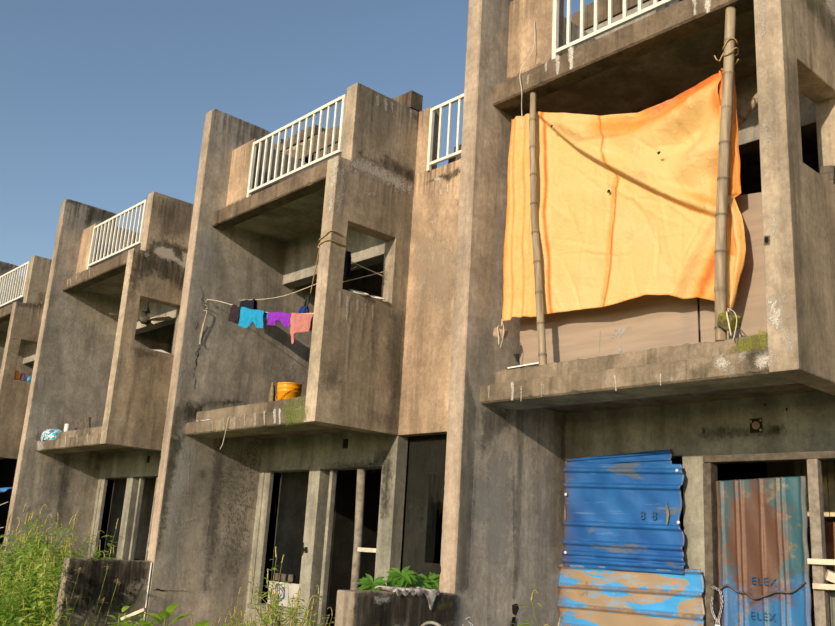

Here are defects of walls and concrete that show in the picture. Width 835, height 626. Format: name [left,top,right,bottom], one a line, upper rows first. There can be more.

leakage [384,156,413,181]
leakage [130,241,188,291]
crack [193,286,206,388]
leakage [354,592,457,626]